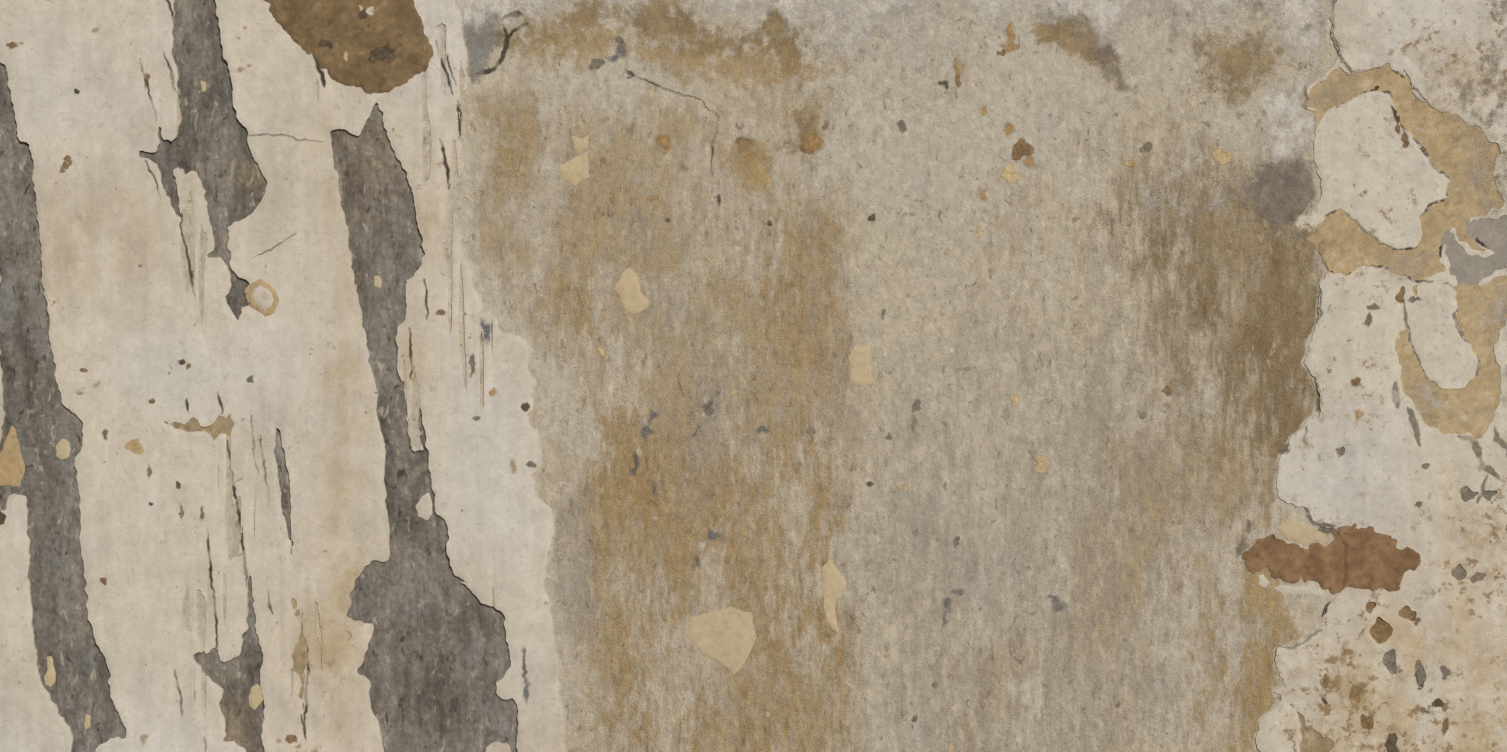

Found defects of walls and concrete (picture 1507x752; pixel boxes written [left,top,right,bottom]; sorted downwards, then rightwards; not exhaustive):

spalling [319,39,348,61]
spalling [359,5,374,18]
peeling [139,0,279,319]
water stain [456,0,1332,459]
peeling [1302,63,1507,439]
peeling [0,42,147,752]
peeling [124,439,152,477]
peeling [330,103,529,752]
peeling [194,576,315,752]
spalling [1242,519,1421,674]
spalling [1349,684,1398,752]
spalling [1415,660,1451,734]